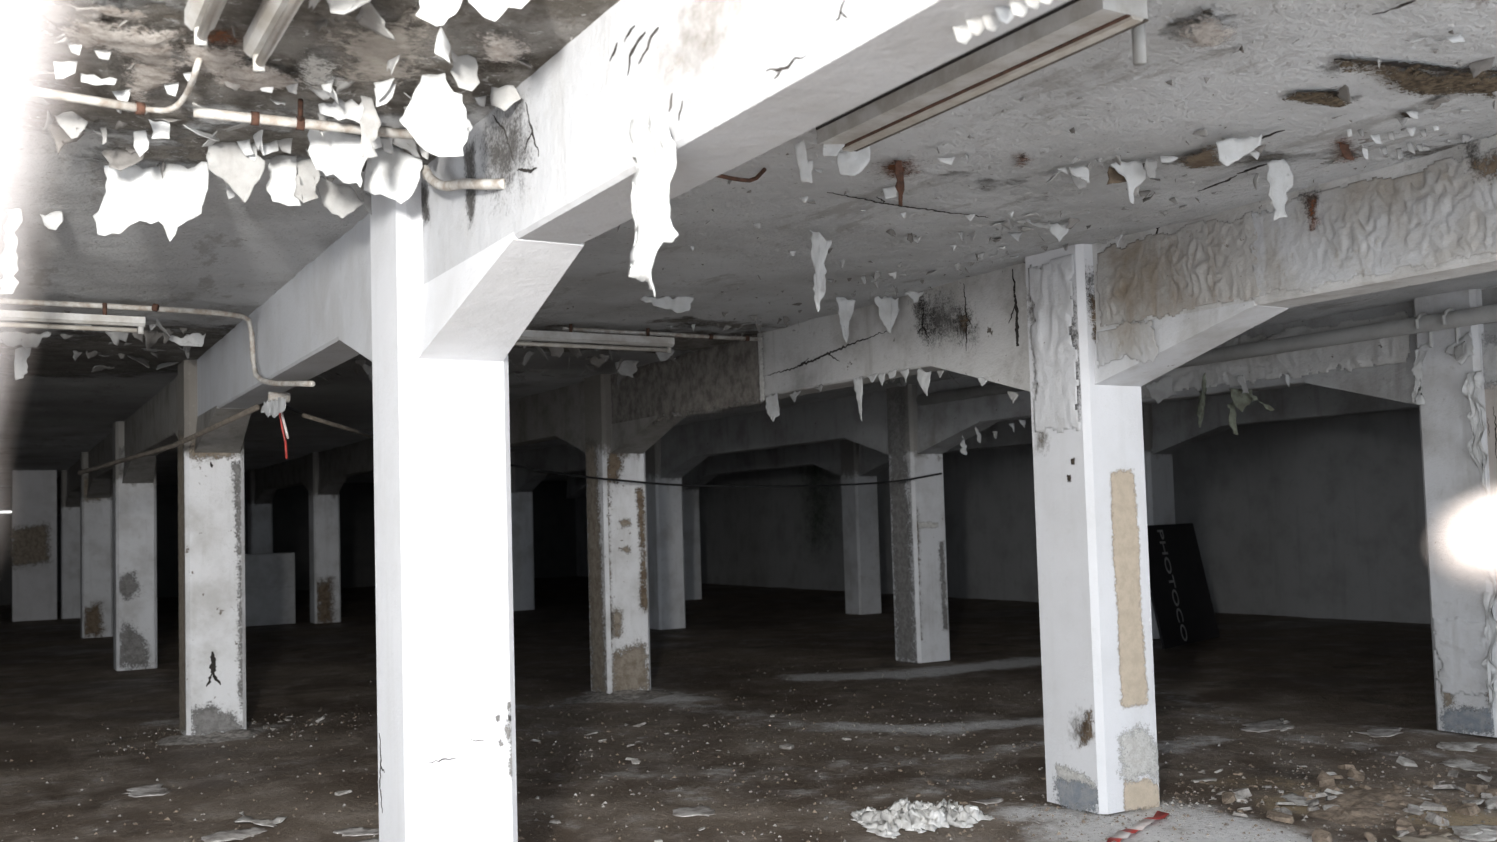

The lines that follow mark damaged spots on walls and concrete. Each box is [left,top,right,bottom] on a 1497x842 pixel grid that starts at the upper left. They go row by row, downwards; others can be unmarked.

peeling [18,0,534,242]
damp [421,181,429,222]
damp [464,102,532,221]
crack [609,25,659,75]
crack [766,54,807,80]
crack [835,0,849,21]
rust [881,159,920,206]
spalling [1279,30,1497,183]
spalling [508,110,1293,427]
spalling [585,439,650,693]
spalling [1110,469,1160,811]
peeling [1052,763,1098,815]